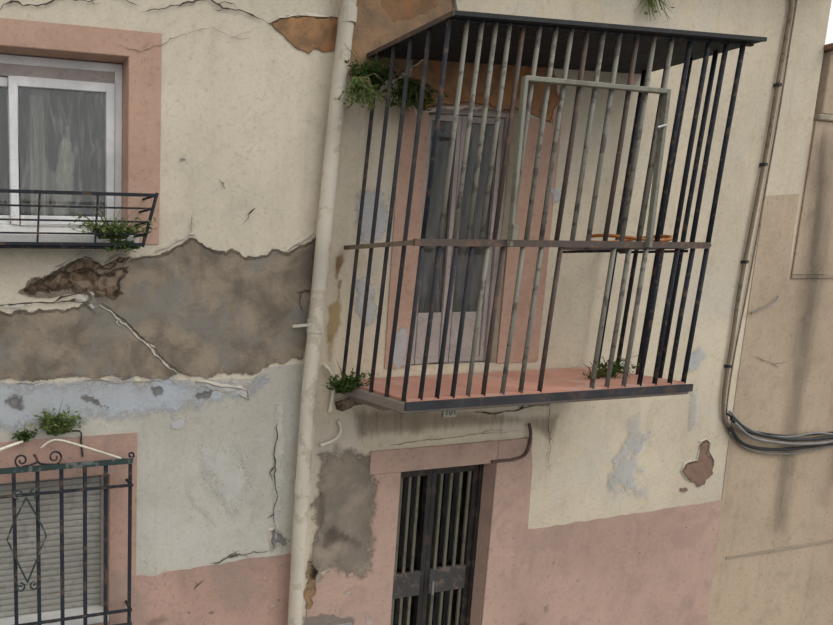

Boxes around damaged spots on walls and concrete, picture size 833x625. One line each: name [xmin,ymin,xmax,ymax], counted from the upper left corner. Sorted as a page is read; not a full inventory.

crack [0,0,94,10]
crack [120,0,271,51]
flaking render [270,12,338,54]
flaking render [347,0,559,125]
crack [0,293,182,375]
flaking render [0,233,316,433]
flaking render [680,438,714,492]
crack [194,426,278,590]
peeling [303,449,379,609]